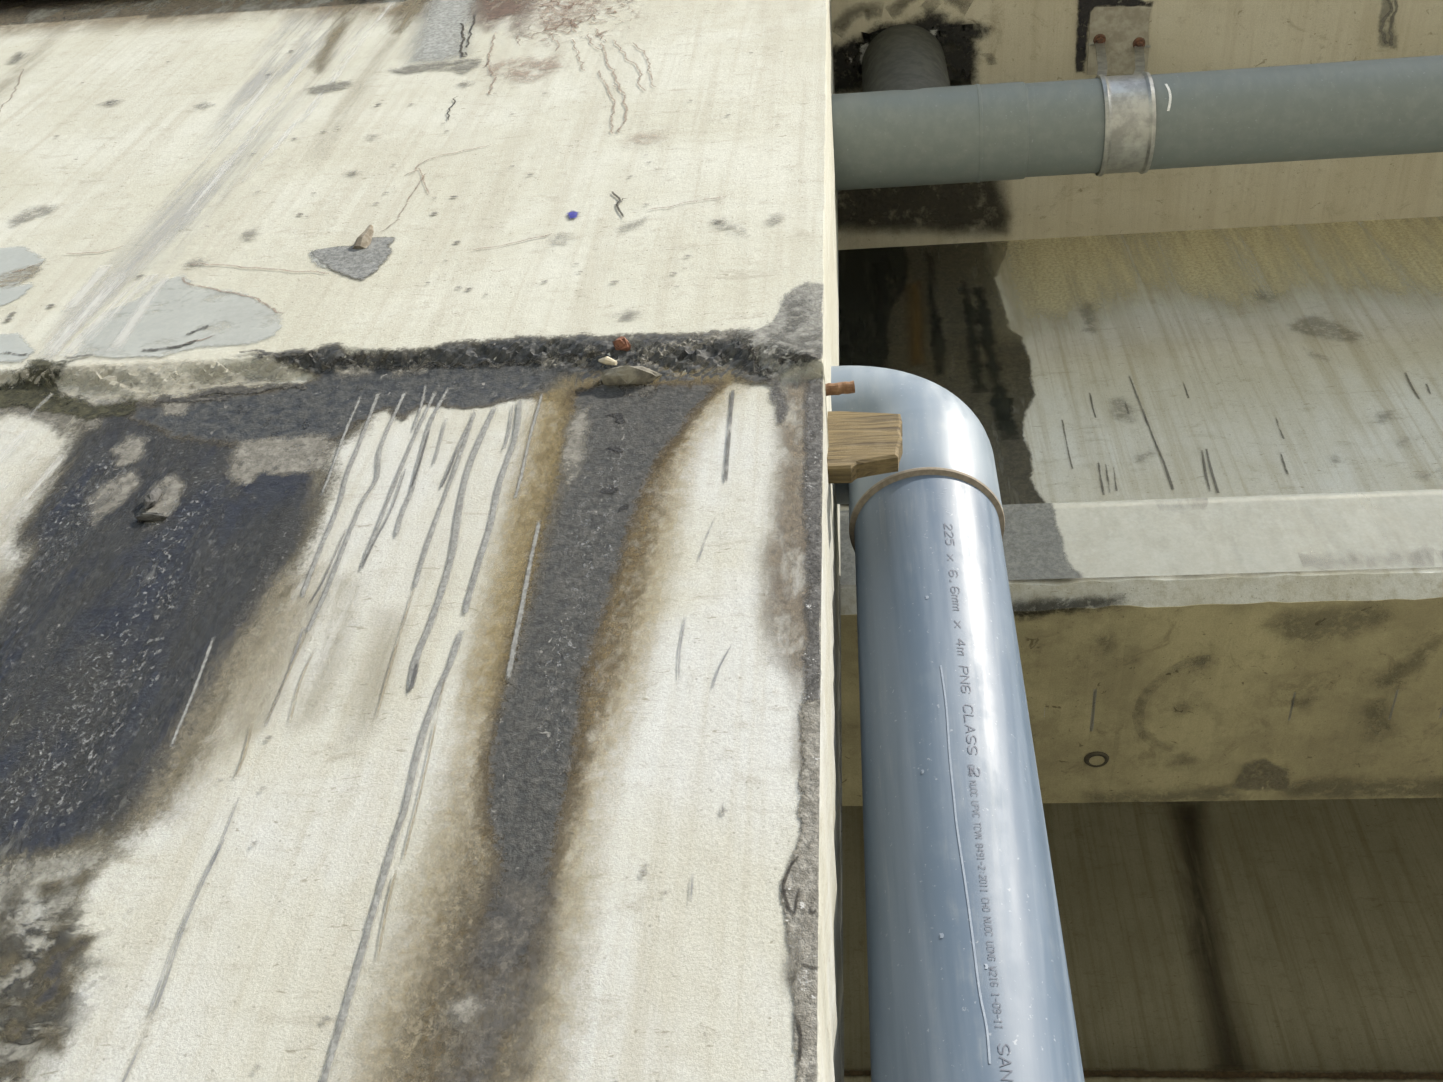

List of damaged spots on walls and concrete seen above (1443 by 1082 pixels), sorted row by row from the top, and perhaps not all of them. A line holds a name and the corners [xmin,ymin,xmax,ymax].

crack [386,15,653,229]
peeling [0,333,34,362]
peeling [0,246,45,306]
peeling [75,275,283,358]
leakage [0,329,779,1082]